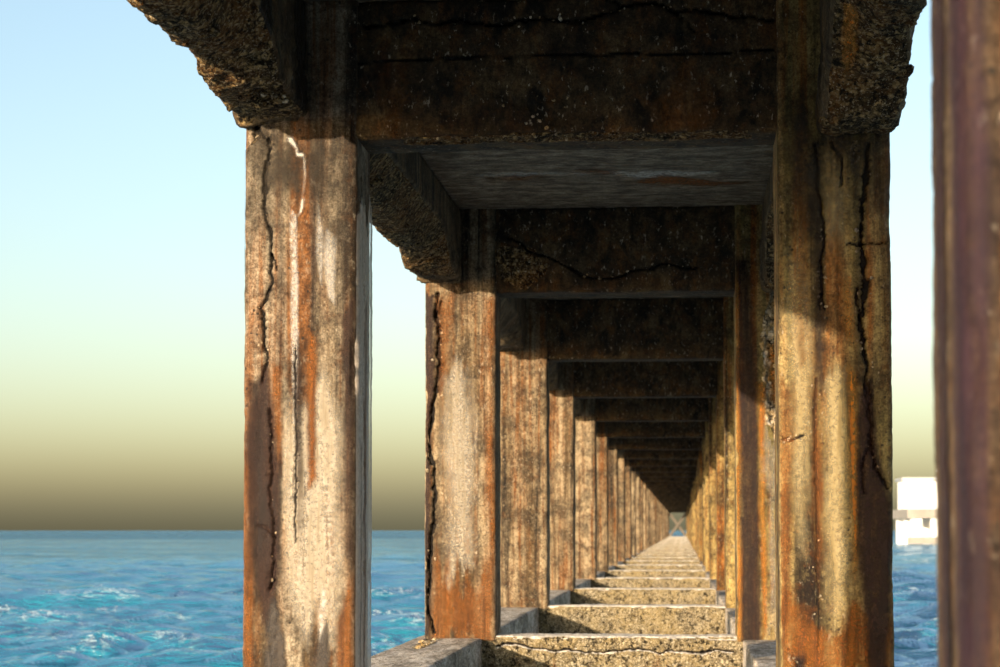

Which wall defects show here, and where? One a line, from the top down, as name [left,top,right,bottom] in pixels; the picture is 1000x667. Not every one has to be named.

spalling [127,0,304,151]
spalling [818,0,925,137]
crack [259,131,303,582]
corrosion [307,333,316,487]
crack [426,292,444,633]
corrosion [425,293,493,640]
spalling [759,199,775,438]
corrosion [736,258,893,667]
crack [817,159,883,387]
corrosion [243,521,253,667]
corrosion [337,532,366,667]
crack [497,642,734,656]